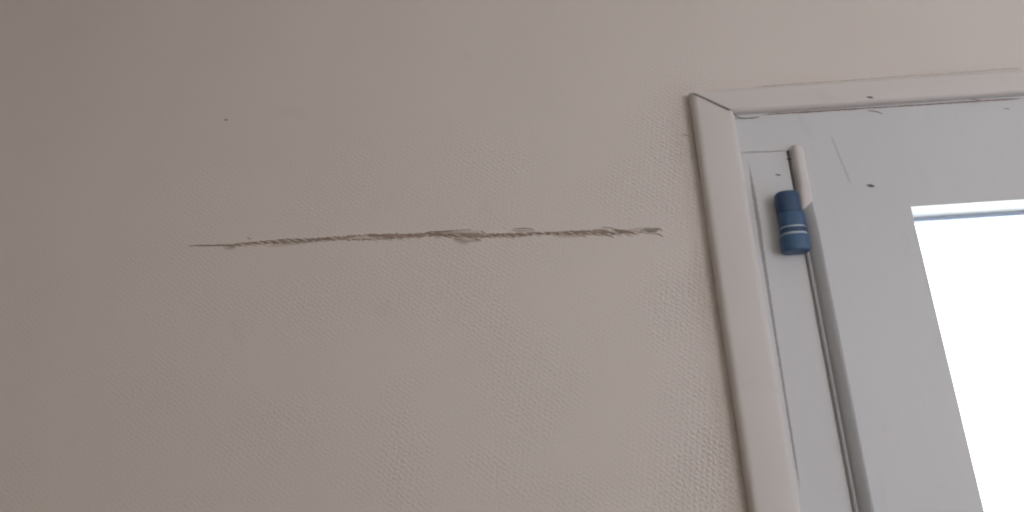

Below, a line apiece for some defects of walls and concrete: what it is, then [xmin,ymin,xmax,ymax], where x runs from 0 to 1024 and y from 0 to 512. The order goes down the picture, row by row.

crack [193,227,663,247]